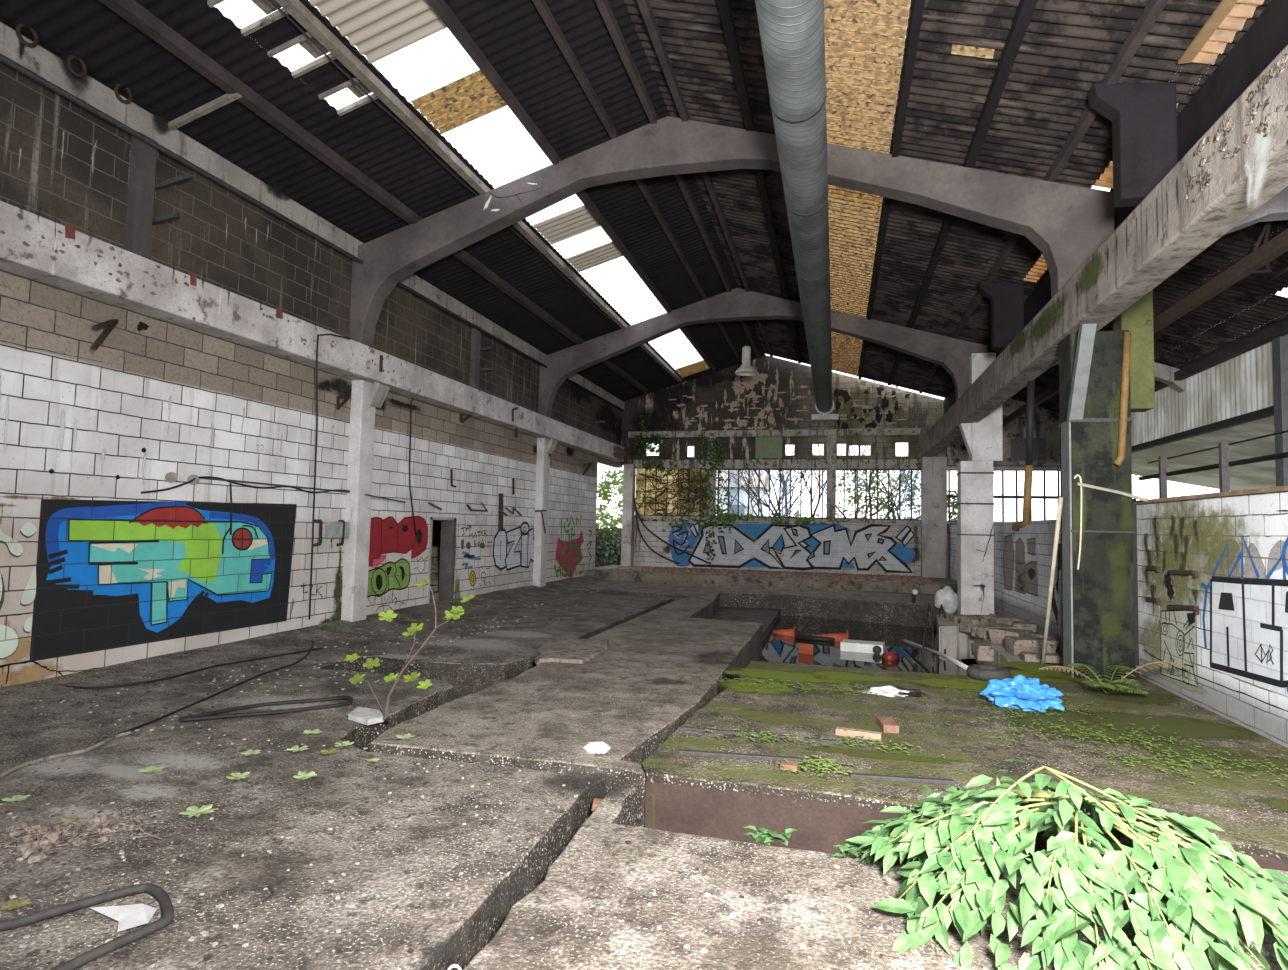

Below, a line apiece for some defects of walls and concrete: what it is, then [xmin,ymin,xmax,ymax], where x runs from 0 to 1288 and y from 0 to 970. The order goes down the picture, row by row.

peeling [23,230,81,261]
peeling [94,246,160,295]
peeling [668,372,811,431]
peeling [833,378,910,429]
leakage [1144,516,1197,605]